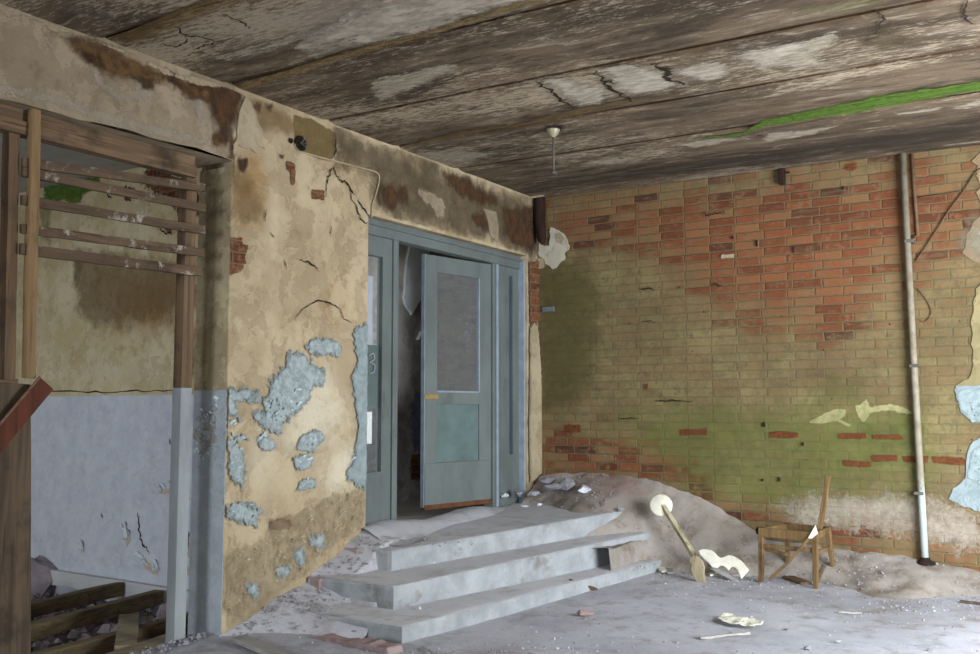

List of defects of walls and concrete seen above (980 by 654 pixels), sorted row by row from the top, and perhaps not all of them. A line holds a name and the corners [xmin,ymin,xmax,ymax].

crack [537,82,574,109]
crack [592,71,632,102]
crack [650,63,685,85]
water stain [893,99,980,116]
crack [325,136,369,224]
flaking render [230,237,248,275]
peeling [529,227,570,325]
peeling [809,399,912,440]
peeling [954,387,980,423]
peeling [200,321,368,623]
peeling [843,446,980,485]